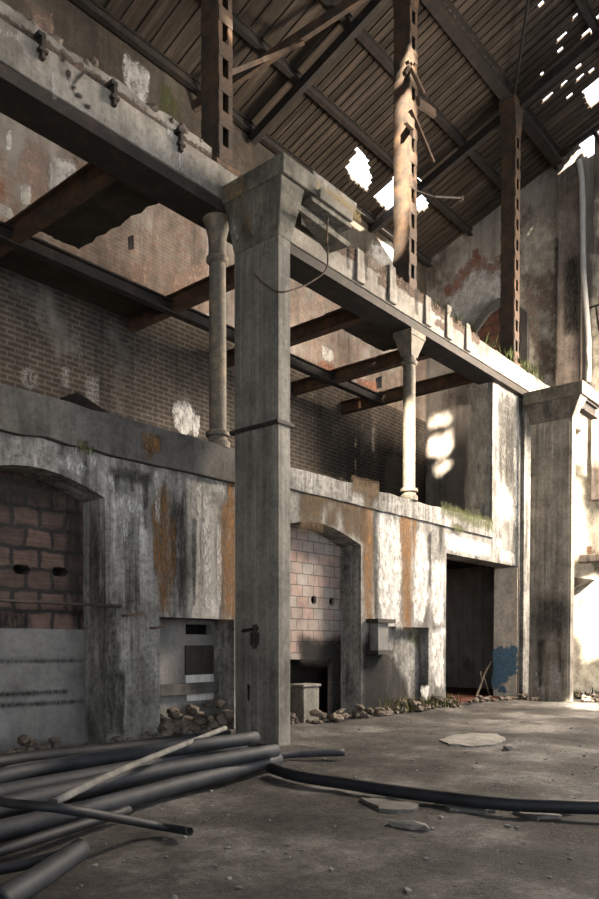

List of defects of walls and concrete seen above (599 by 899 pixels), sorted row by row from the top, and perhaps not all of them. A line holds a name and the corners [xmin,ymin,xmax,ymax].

spalling [0,7,232,167]
flaking render [0,183,14,219]
flaking render [337,242,501,345]
corrosion [152,489,175,612]
corrosion [218,483,235,616]
corrosion [400,516,417,625]